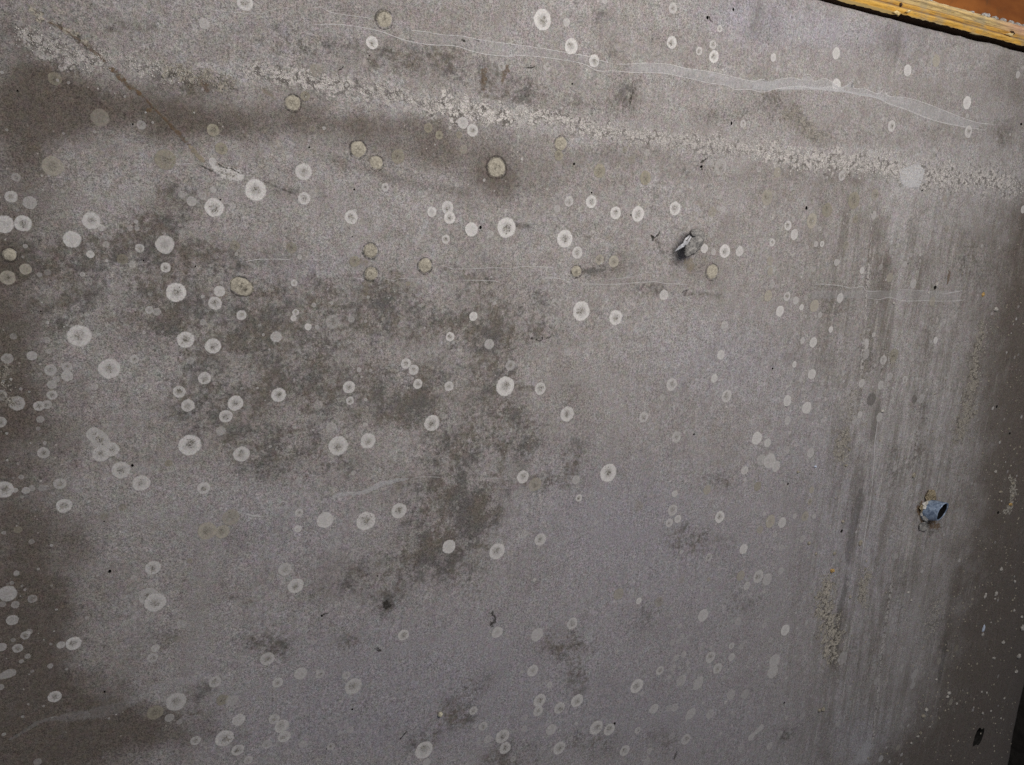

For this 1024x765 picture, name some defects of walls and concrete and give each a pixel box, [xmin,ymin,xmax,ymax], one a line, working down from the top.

damp [245,179,266,201]
damp [0,191,36,233]
damp [63,212,105,258]
damp [427,201,478,244]
damp [497,217,516,238]
damp [135,235,186,302]
damp [67,325,92,347]
damp [177,332,221,353]
damp [0,351,73,427]
damp [496,361,514,396]
damp [219,395,243,422]
efflorescence [443,540,455,553]